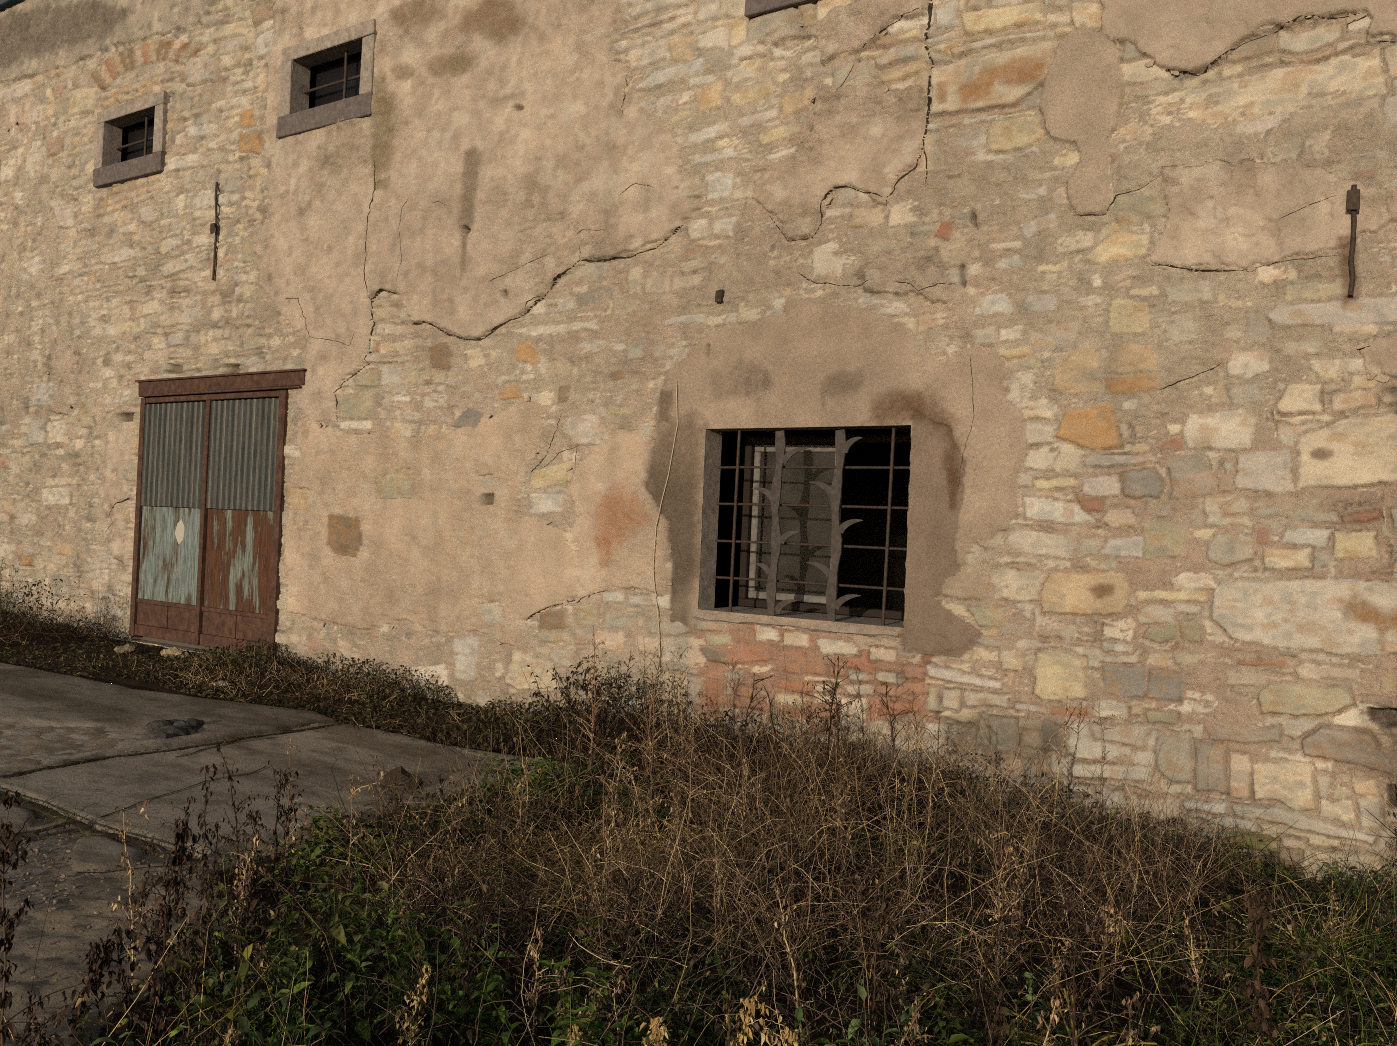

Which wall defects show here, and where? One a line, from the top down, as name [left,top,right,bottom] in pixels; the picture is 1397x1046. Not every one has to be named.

flaking render [0,0,307,657]
crack [286,163,683,417]
flaking render [238,0,1397,901]
crack [767,0,953,291]